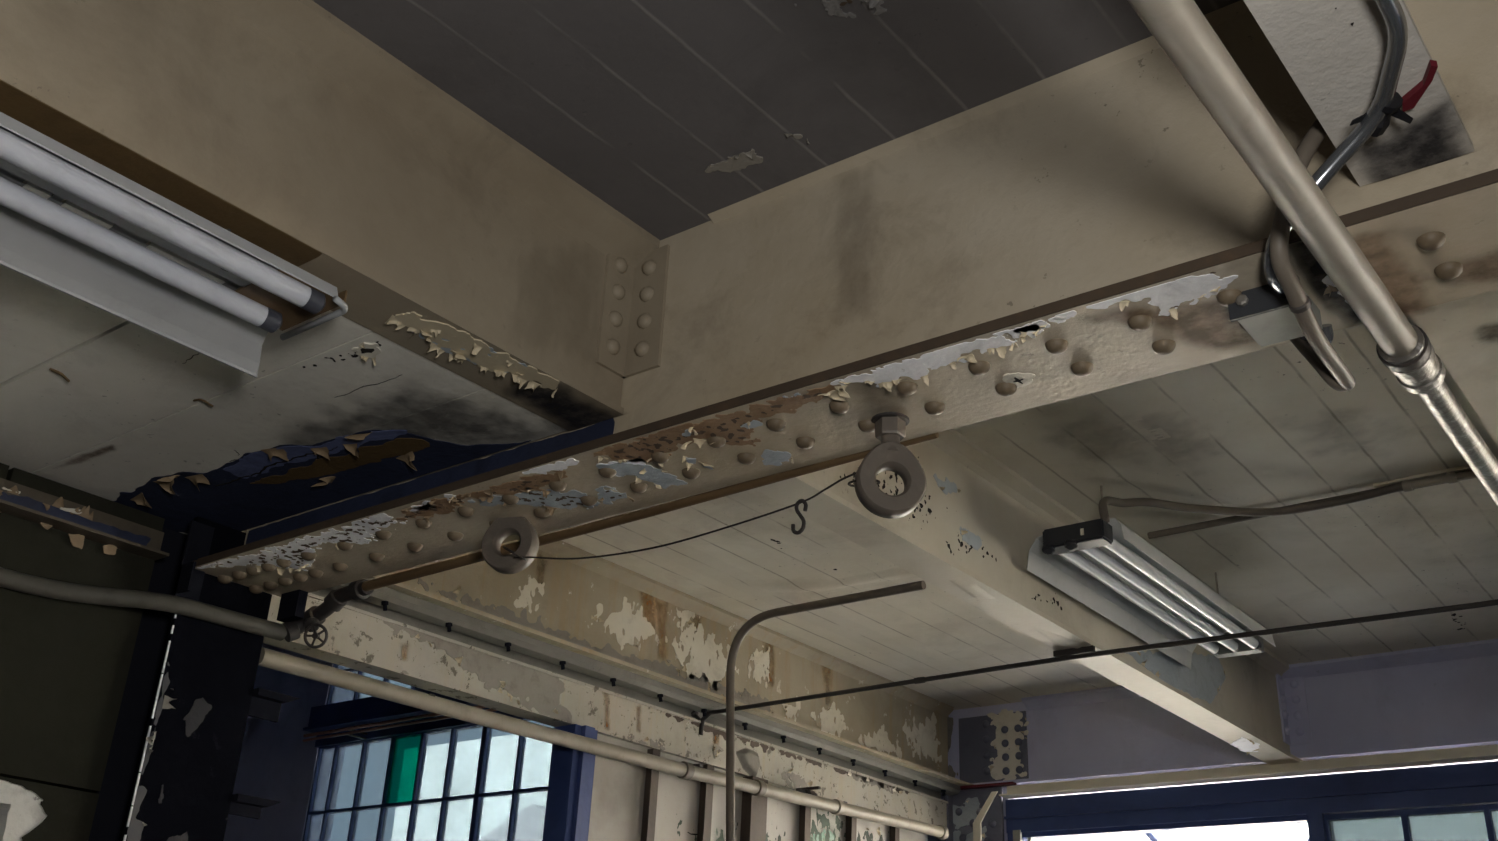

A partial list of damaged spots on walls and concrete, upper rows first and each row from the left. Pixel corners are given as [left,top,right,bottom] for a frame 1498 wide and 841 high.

peeling [197,272,1238,575]
peeling [0,430,531,555]
peeling [418,577,958,778]
peeling [127,662,212,841]
peeling [665,713,909,794]
peeling [987,709,1029,781]
peeling [953,797,987,841]